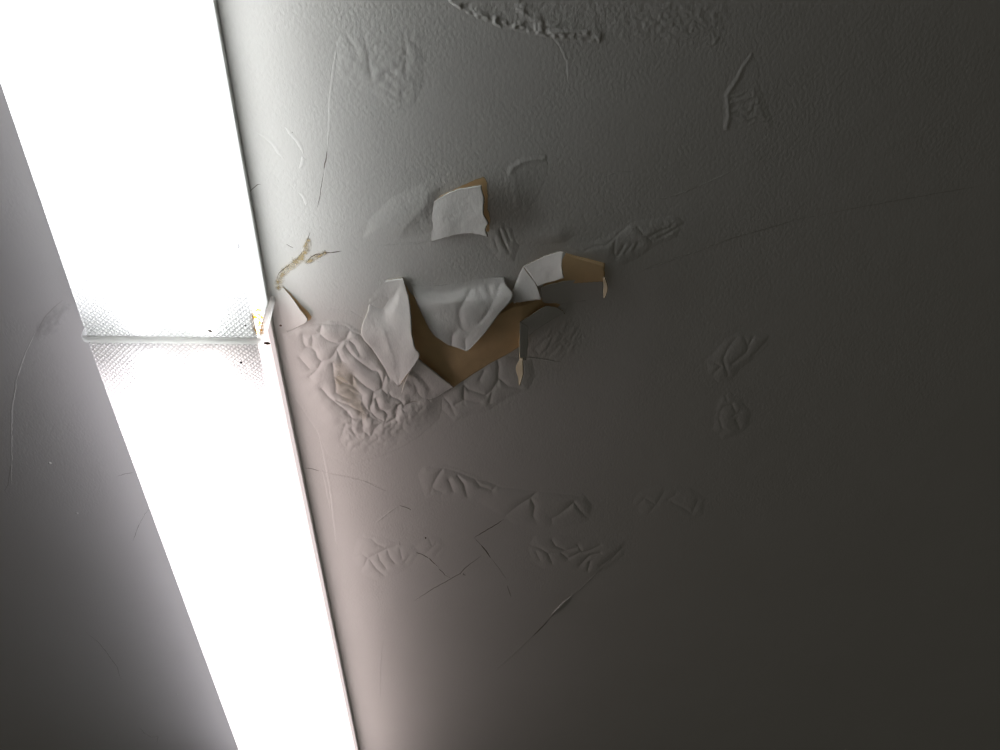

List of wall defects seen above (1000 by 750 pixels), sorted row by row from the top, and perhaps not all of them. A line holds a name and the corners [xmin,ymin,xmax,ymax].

peeling [363,177,490,246]
peeling [361,251,608,402]
crack [399,519,511,598]